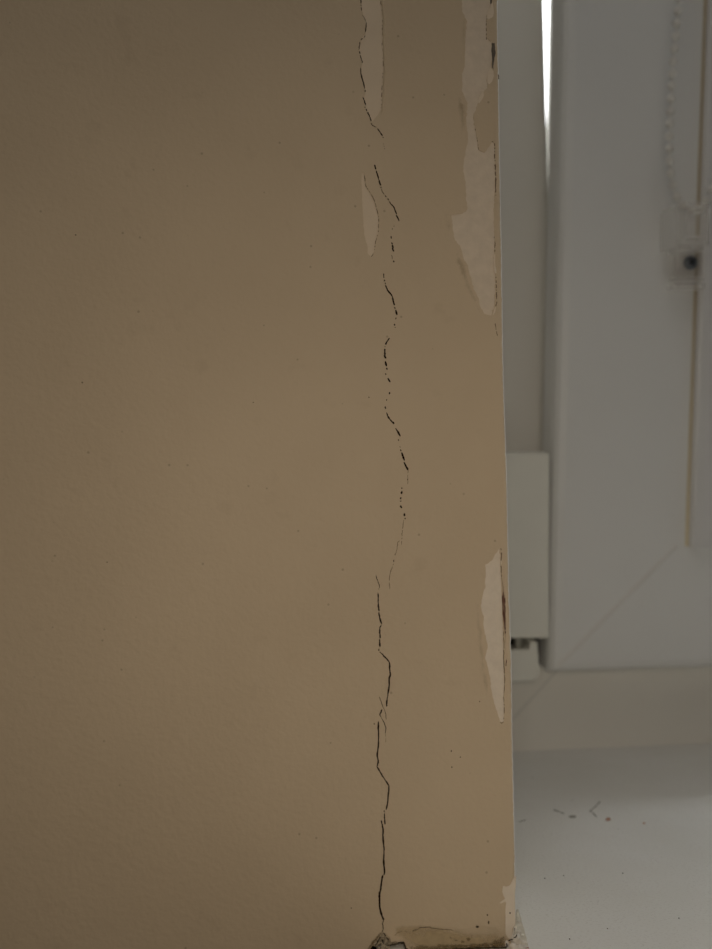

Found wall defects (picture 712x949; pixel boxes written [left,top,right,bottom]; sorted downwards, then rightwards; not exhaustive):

peeling [451,0,499,336]
crack [359,0,454,935]
peeling [481,548,505,724]